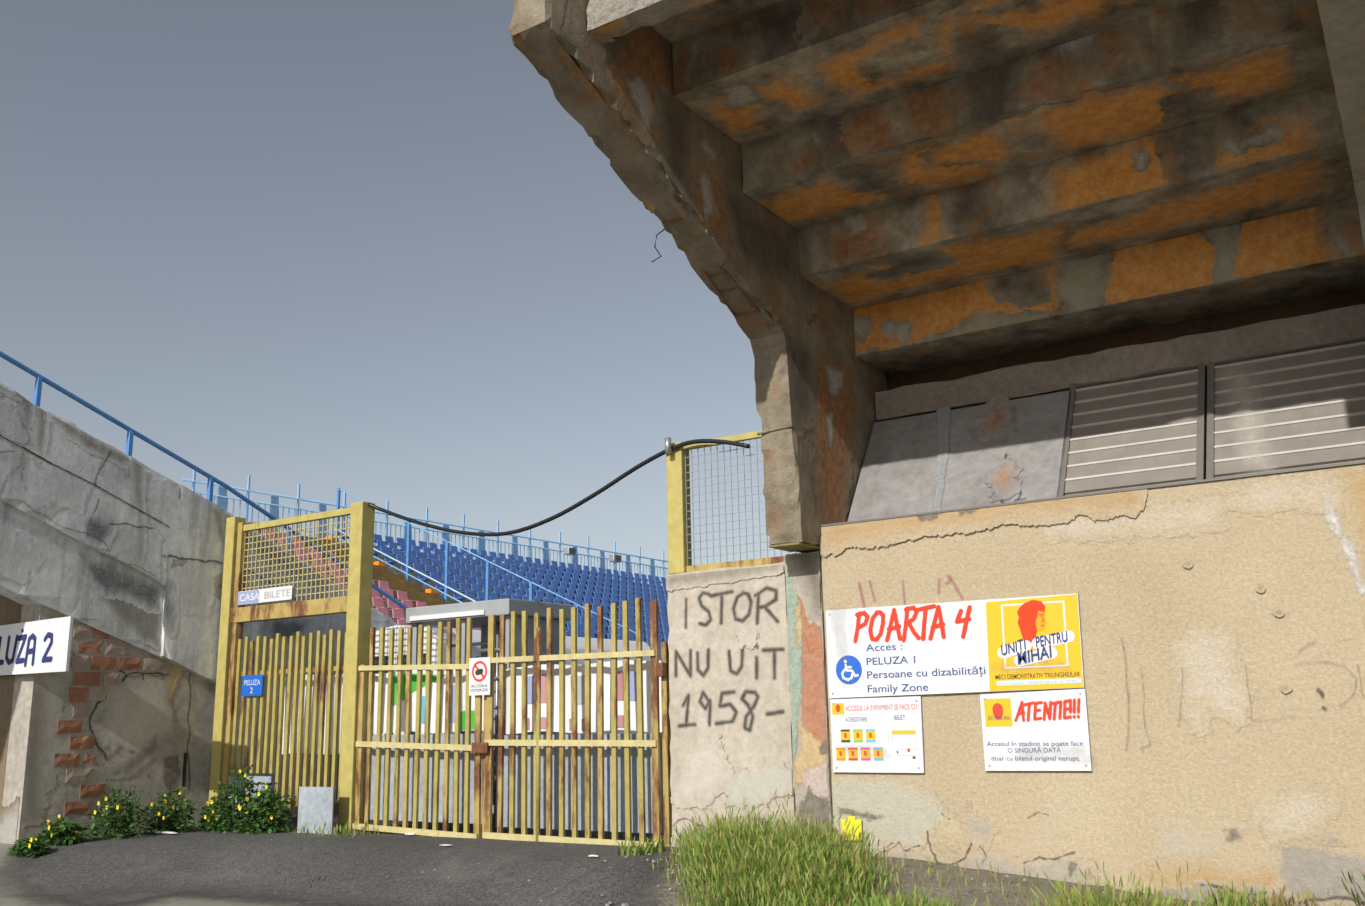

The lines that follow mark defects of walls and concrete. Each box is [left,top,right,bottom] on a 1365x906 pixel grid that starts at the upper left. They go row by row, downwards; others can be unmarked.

spalling [704,267,771,329]
rust [551,0,1344,557]
crack [0,451,224,573]
water stain [0,386,231,650]
flaking render [34,622,172,816]
spalling [147,756,180,793]
peeling [785,567,1098,886]
crack [1300,896,1365,904]